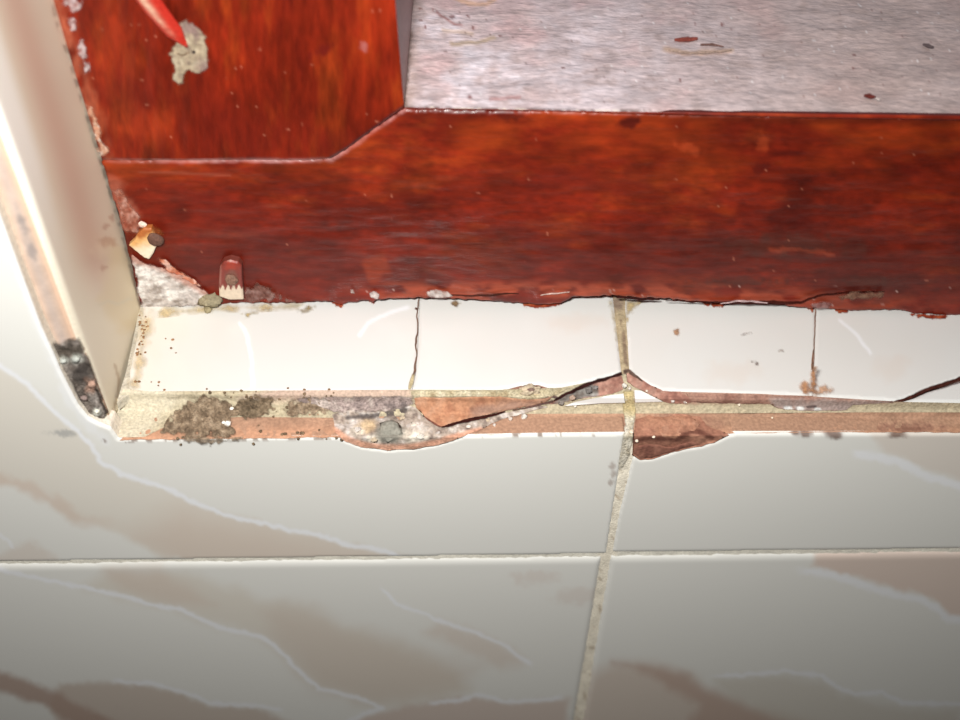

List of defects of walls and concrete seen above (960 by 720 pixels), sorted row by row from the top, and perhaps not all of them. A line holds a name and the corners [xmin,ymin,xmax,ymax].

peeling [115,189,139,233]
peeling [132,255,207,308]
crack [408,299,642,428]
crack [616,291,884,371]
spalling [298,373,960,460]